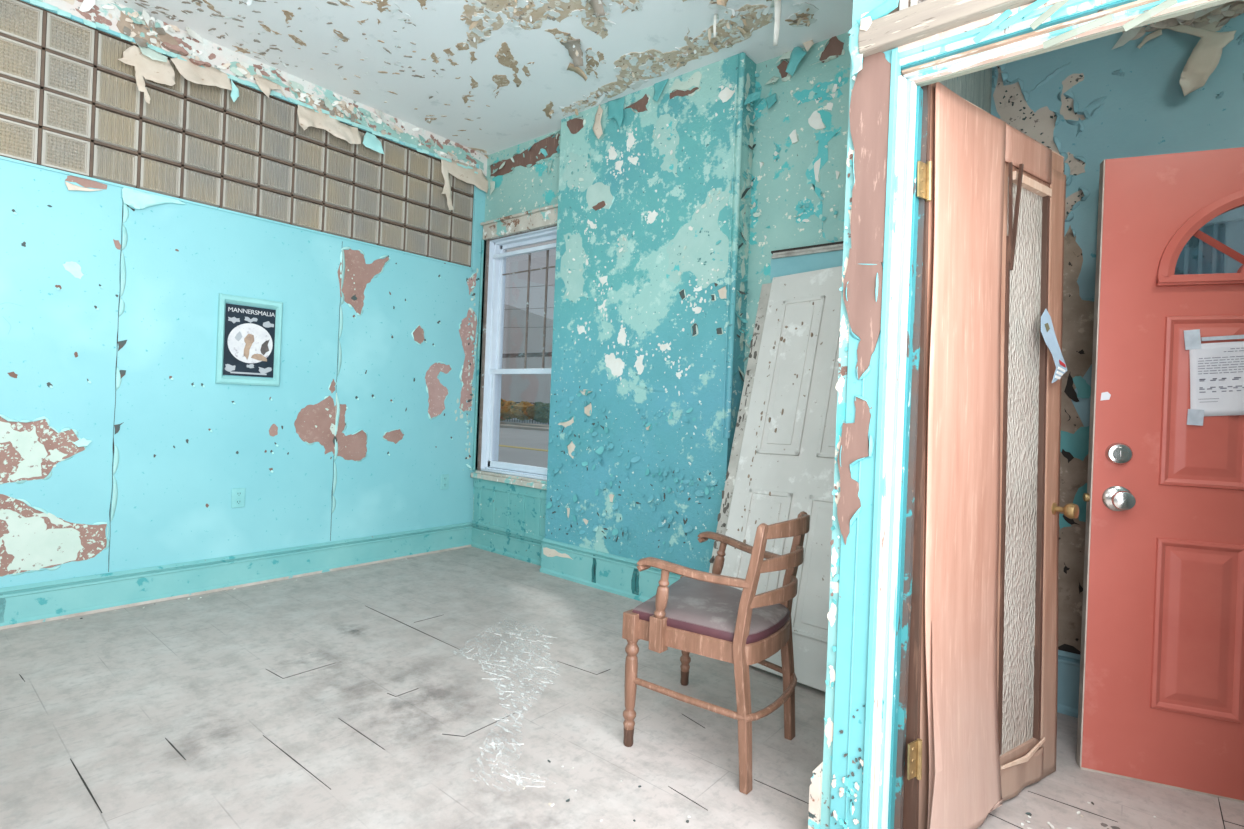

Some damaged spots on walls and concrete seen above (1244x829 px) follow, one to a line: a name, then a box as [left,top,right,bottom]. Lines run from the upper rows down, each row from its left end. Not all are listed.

peeling [819,36,845,63]
peeling [1043,0,1244,50]
peeling [30,0,819,396]
peeling [0,415,110,577]
peeling [265,379,375,473]
peeling [383,428,405,456]
peeling [413,268,479,470]
peeling [543,386,693,559]
peeling [666,52,897,626]
flaking render [952,0,1095,655]
peeling [824,718,843,747]
spalling [831,748,864,829]